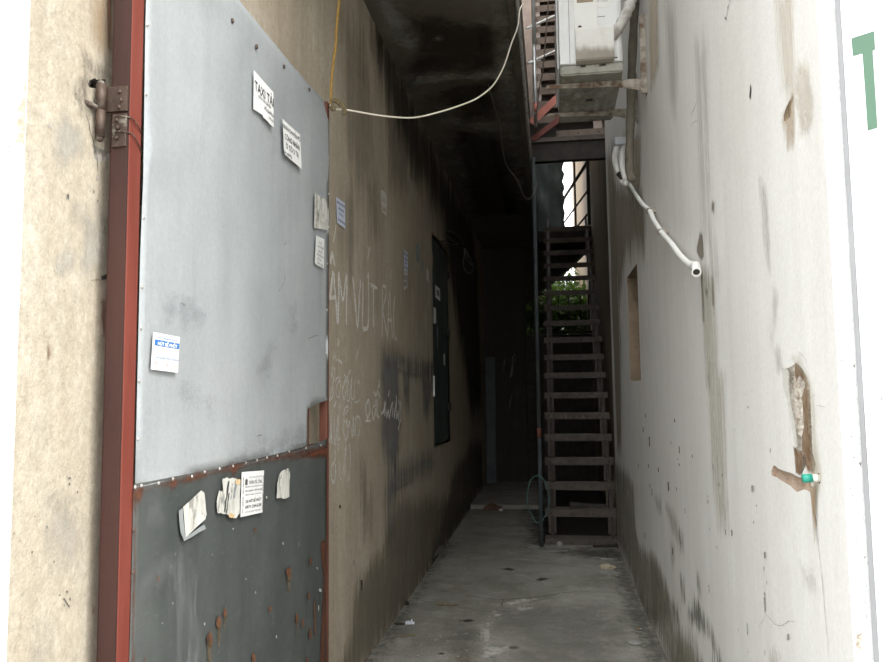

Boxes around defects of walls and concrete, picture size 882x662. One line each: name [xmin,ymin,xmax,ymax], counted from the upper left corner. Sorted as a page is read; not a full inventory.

corrosion [296,541,326,662]
damp [344,351,482,662]
damp [566,465,720,662]
flaking render [782,362,816,475]